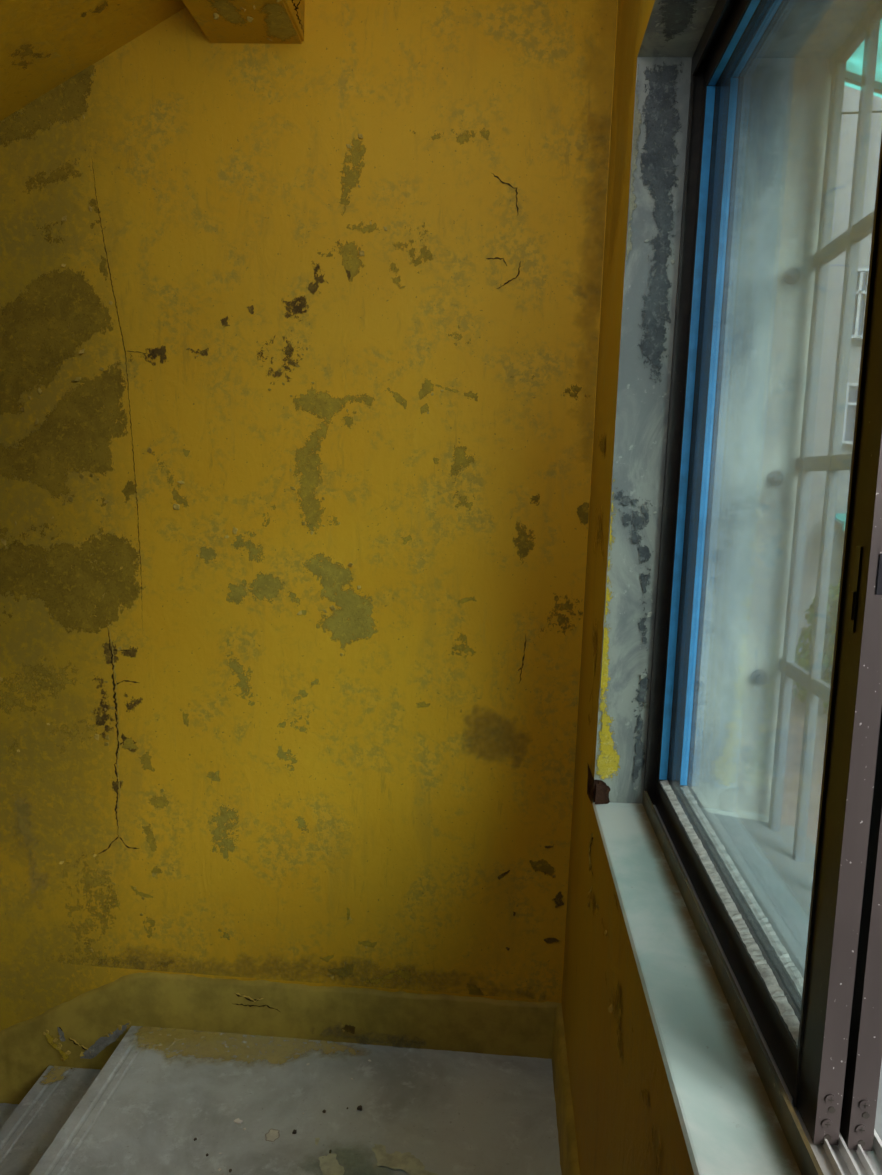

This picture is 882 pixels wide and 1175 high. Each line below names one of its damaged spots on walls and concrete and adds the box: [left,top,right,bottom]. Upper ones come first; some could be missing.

peeling [283,134,387,322]
peeling [389,222,433,289]
crack [90,149,147,621]
peeling [256,336,375,535]
peeling [387,379,478,414]
peeling [450,446,475,514]
peeling [224,504,306,615]
peeling [303,553,378,656]
crack [98,625,139,854]
flaking render [80,1021,131,1059]